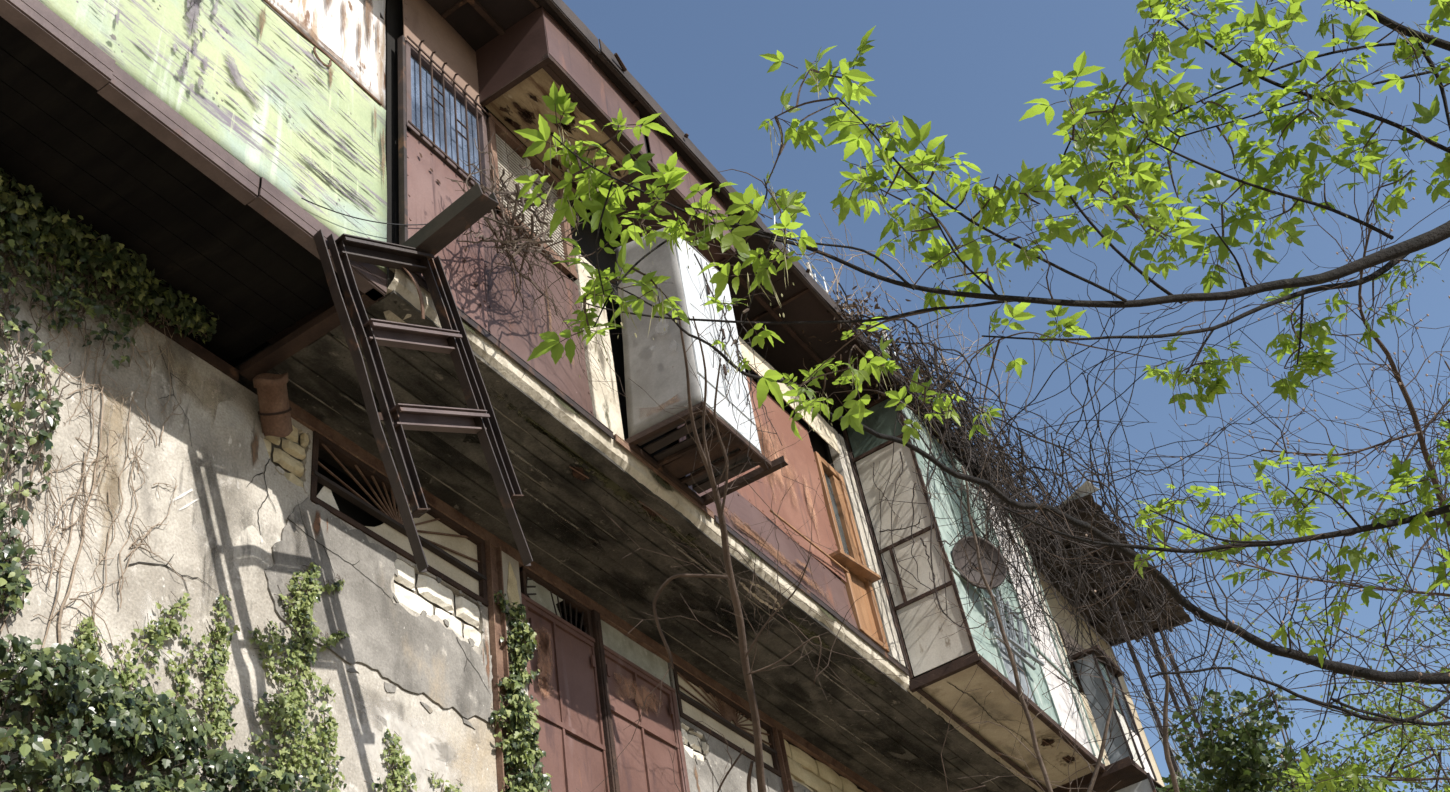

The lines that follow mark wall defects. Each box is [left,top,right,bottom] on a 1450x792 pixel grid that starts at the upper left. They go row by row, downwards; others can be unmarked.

rust [374,108,385,182]
damp [403,379,453,407]
damp [555,394,580,416]
damp [404,430,493,479]
damp [652,473,674,491]
crack [247,459,396,605]
peeling [255,409,493,730]
damp [670,586,746,640]